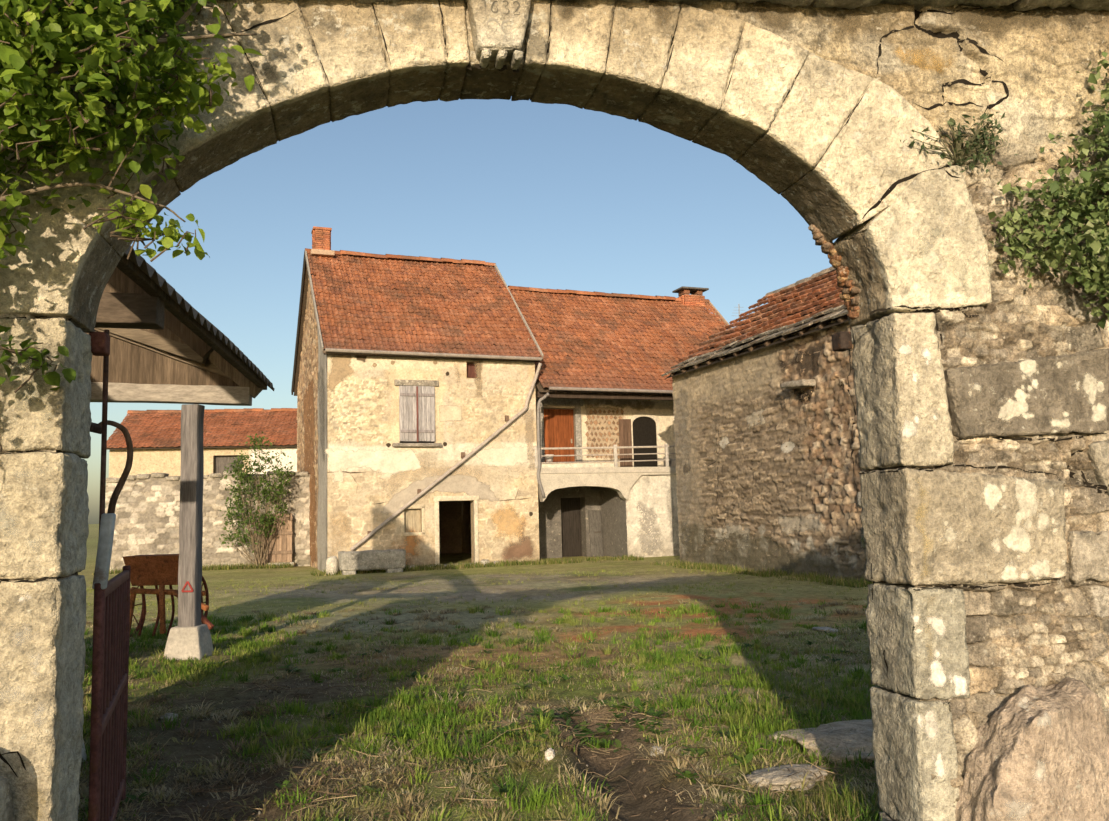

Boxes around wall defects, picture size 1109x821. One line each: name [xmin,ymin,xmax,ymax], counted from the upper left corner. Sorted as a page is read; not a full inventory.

crack [877,6,1025,124]
crack [843,165,960,232]
crack [0,751,26,777]